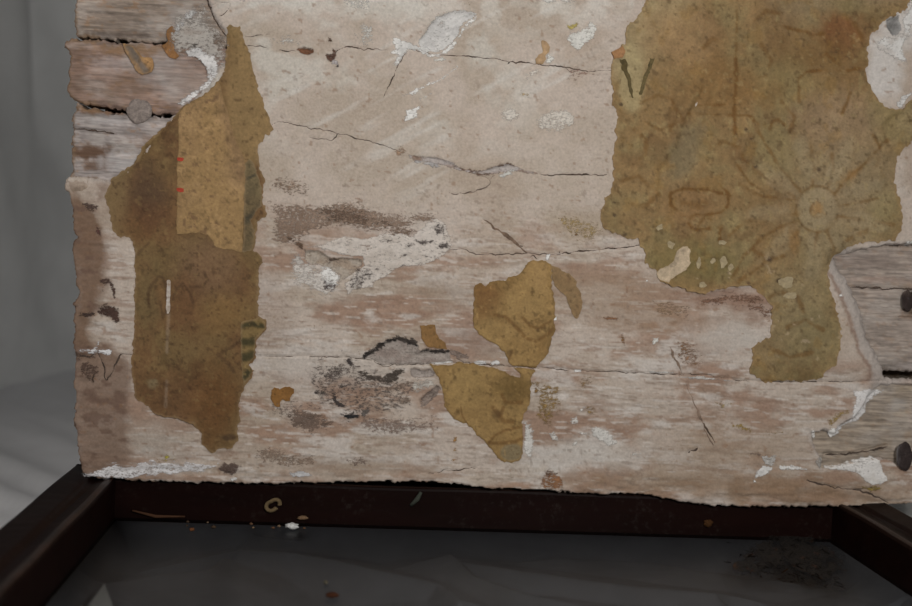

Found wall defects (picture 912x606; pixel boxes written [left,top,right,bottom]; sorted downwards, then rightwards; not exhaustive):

spalling [171,4,229,105]
spalling [391,10,477,66]
crack [384,49,611,96]
crack [276,122,405,153]
crack [541,170,607,178]
peeling [291,219,451,295]
leakage [273,350,438,434]
spalling [362,335,500,407]
spalling [827,389,881,437]
leakage [257,447,314,466]
peeling [524,422,535,457]
peeling [816,456,887,485]